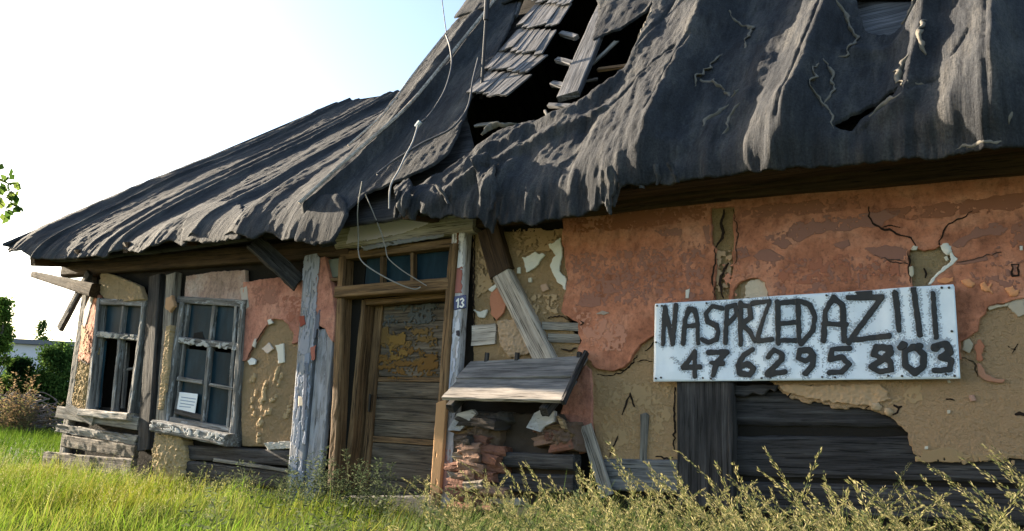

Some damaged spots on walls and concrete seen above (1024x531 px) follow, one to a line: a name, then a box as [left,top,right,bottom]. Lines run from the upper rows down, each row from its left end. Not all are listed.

spalling [71,331,138,409]
flaking render [150,295,236,441]
spalling [240,256,320,496]
spalling [378,233,532,494]
spalling [504,232,681,460]
crack [711,209,739,299]
spalling [770,243,1024,462]
crack [868,206,1001,283]